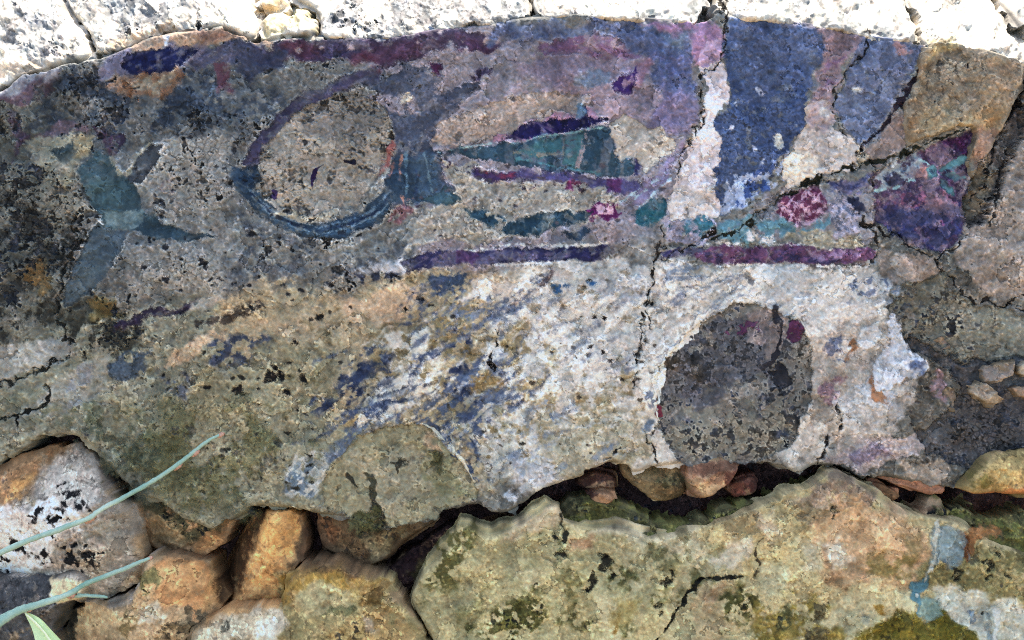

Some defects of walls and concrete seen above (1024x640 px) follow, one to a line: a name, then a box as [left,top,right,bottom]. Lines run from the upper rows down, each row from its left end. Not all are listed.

crack [0,213,99,427]
crack [677,0,729,181]
crack [633,28,968,386]
crack [859,215,1024,311]
crack [970,80,1024,226]
crack [656,538,764,640]